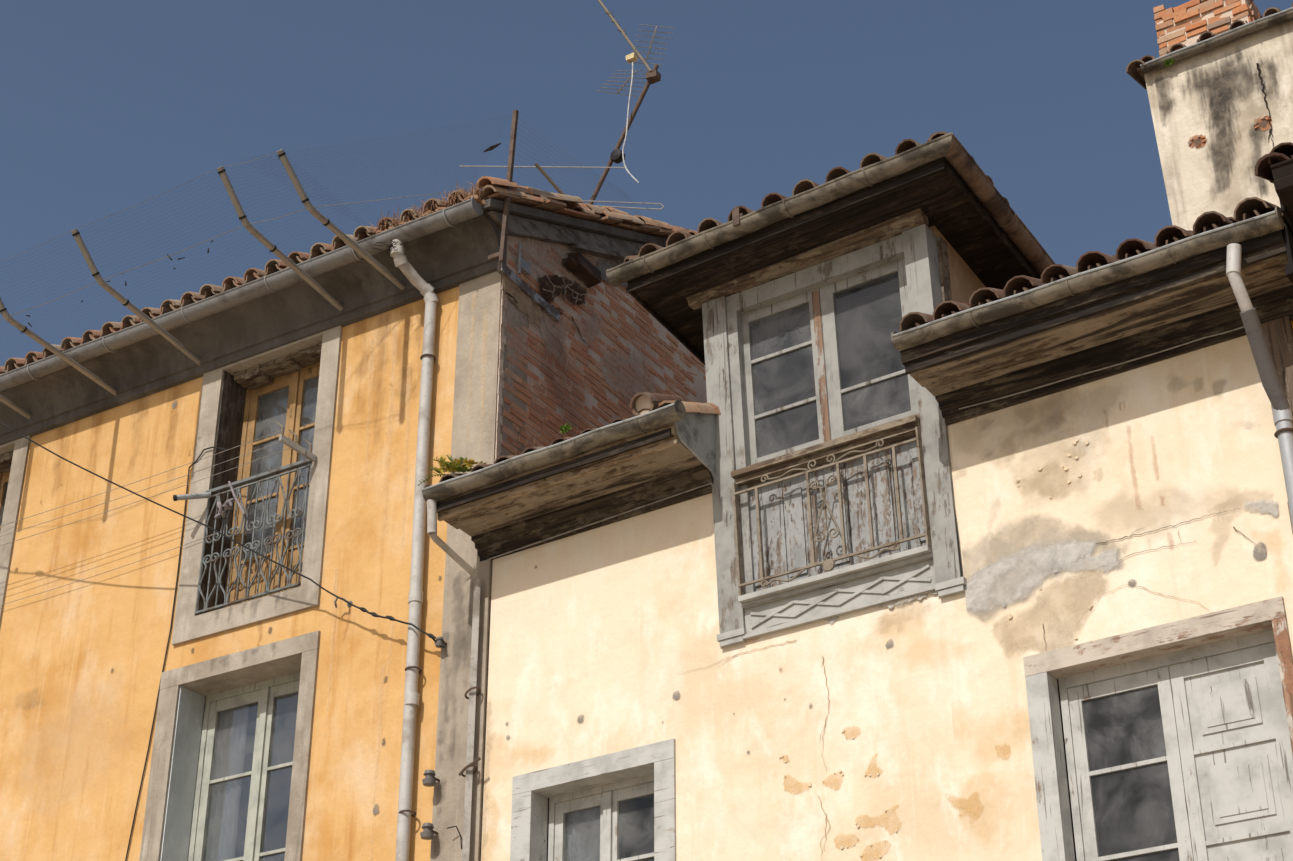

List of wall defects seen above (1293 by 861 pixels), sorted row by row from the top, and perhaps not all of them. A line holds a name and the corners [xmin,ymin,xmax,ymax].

leakage [1155,79,1172,116]
leakage [1187,51,1276,193]
crack [1256,63,1274,147]
crack [1085,508,1254,619]
crack [679,640,830,855]